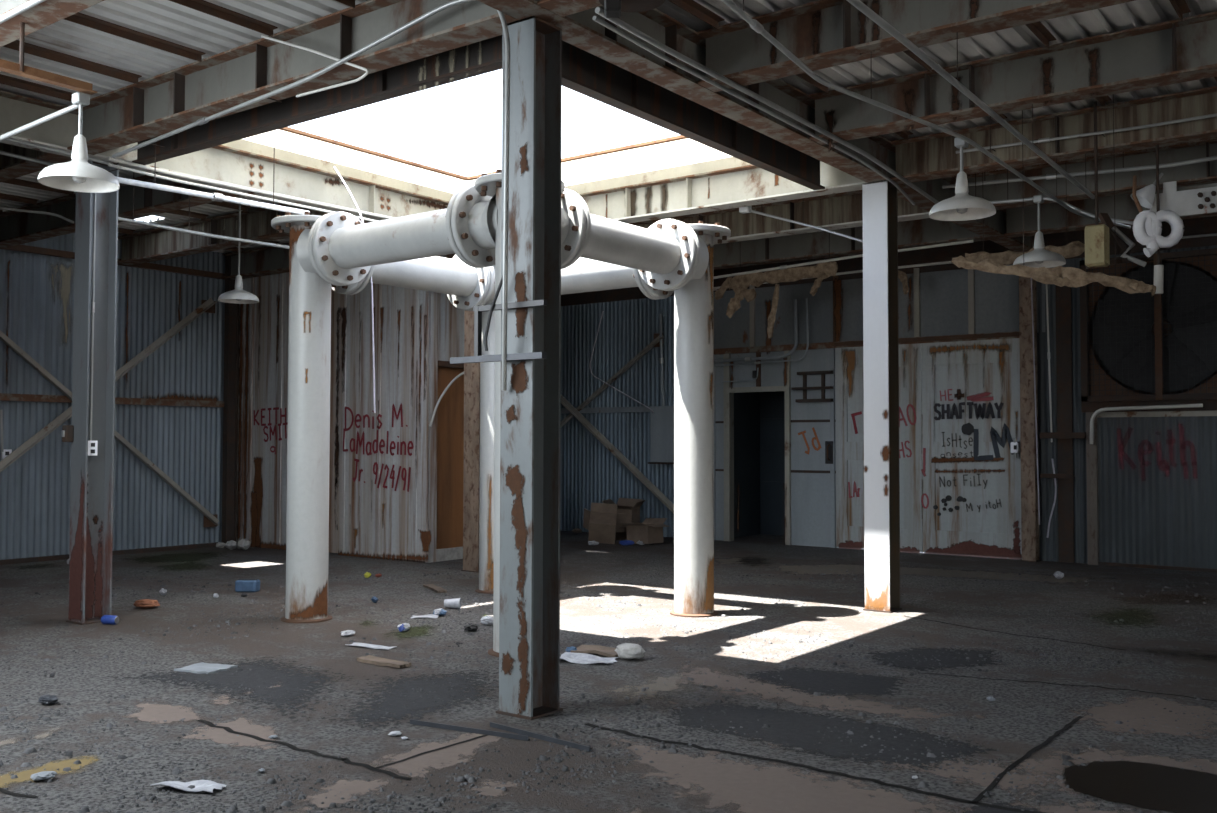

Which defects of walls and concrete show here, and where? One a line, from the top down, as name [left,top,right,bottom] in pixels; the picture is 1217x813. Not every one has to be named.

corrosion [290,581,328,620]
corrosion [701,557,714,613]
crack [924,673,1216,701]
crack [197,719,488,780]
crack [585,716,1083,813]
damp [1063,760,1217,813]